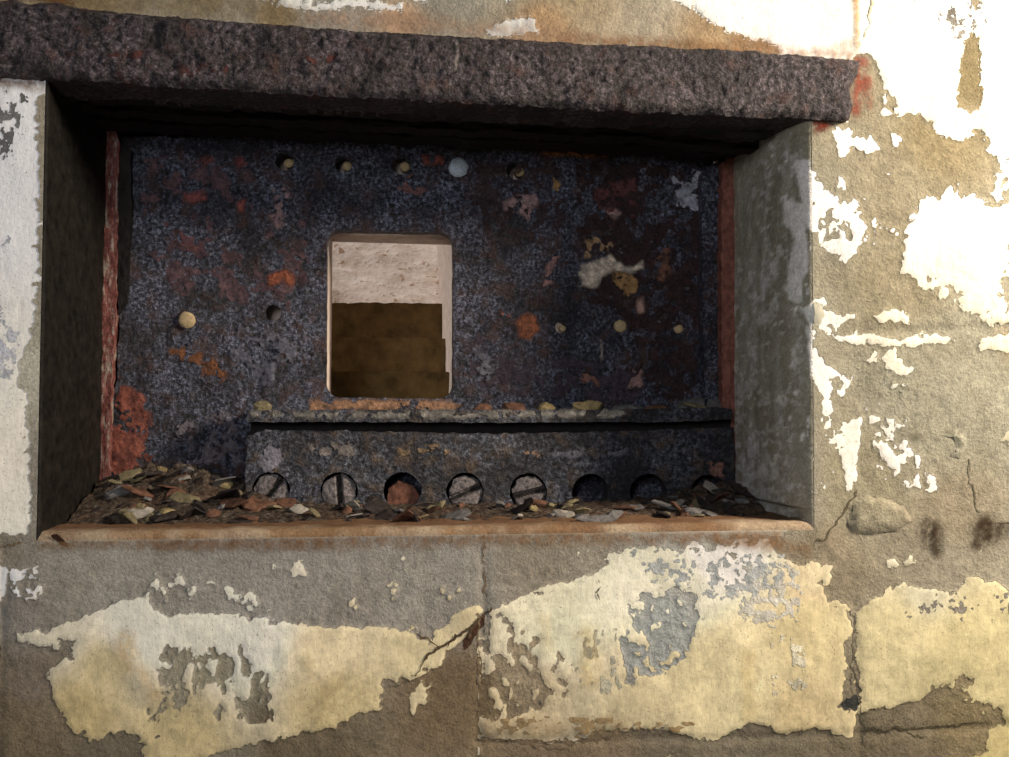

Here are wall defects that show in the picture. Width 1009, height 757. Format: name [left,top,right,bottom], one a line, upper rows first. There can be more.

peeling [0,0,779,54]
peeling [939,0,987,114]
peeling [0,93,28,160]
corrosion [80,101,759,155]
corrosion [111,386,153,475]
corrosion [251,397,721,420]
corrosion [289,504,309,514]
water stain [923,522,940,557]
water stain [973,516,1006,547]
crack [414,535,625,751]
peeling [147,644,274,724]
peeling [209,609,1006,757]